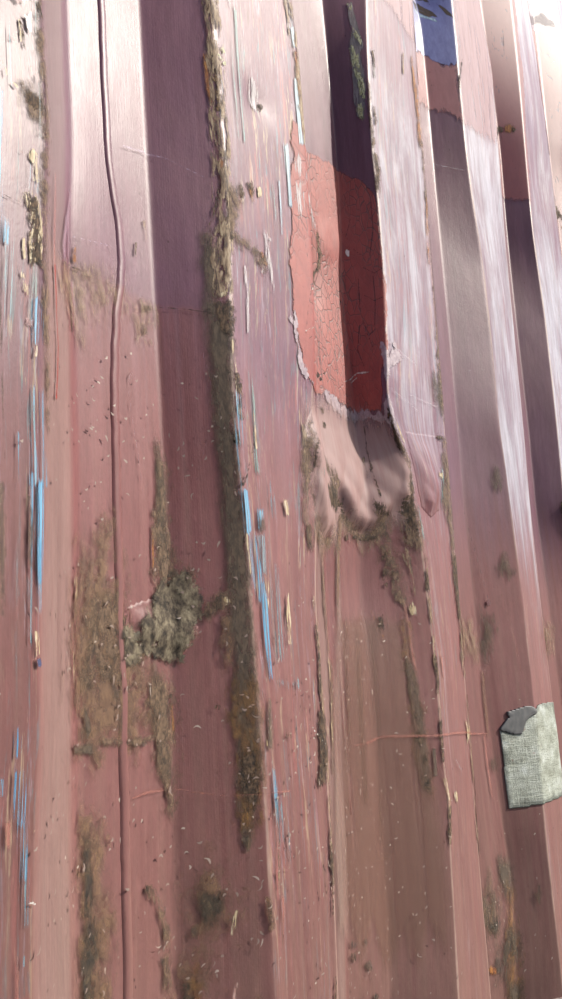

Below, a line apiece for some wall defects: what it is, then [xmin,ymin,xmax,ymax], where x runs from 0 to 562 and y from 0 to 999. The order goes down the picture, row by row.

rust [35,1,118,391]
rust [201,0,267,297]
peeling [295,153,305,213]
crack [301,195,382,390]
peeling [289,311,399,434]
peeling [380,341,403,381]
rust [71,520,176,817]
rust [302,407,458,844]
rust [78,815,116,999]